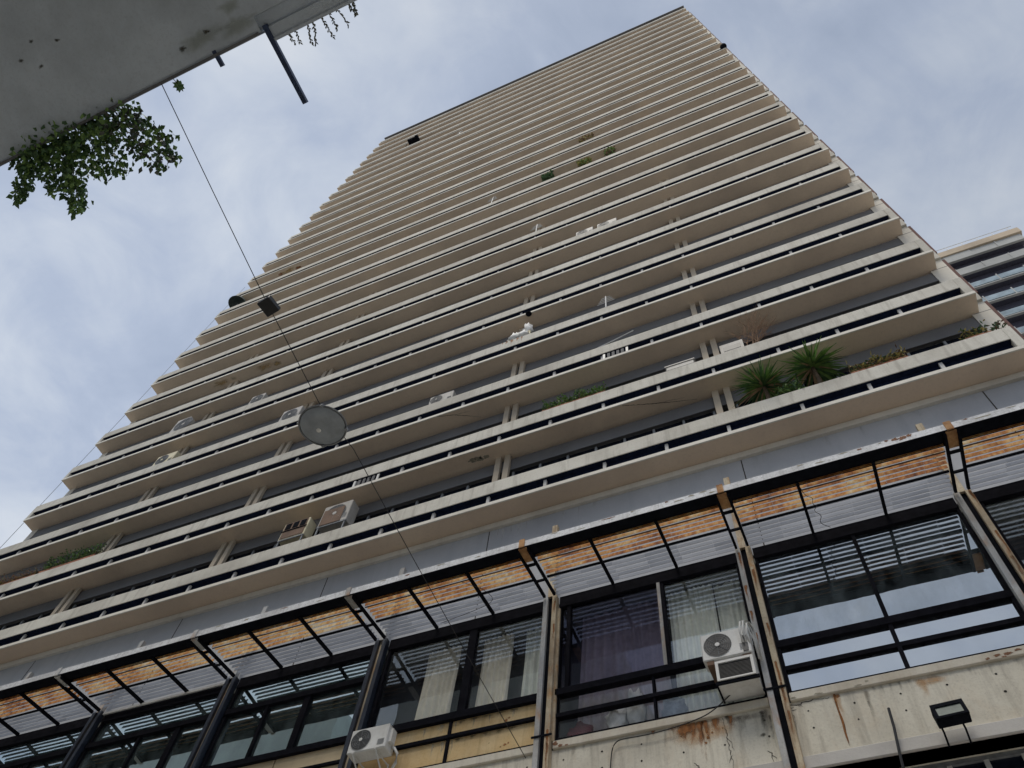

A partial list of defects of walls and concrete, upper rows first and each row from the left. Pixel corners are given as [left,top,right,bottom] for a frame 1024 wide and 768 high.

corrosion [671,715,732,744]
corrosion [833,694,849,743]